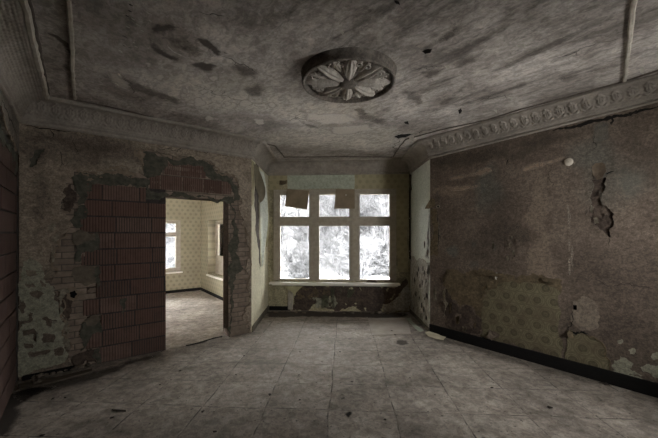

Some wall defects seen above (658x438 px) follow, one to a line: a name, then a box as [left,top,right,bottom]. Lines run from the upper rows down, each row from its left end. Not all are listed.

leakage [152,39,221,81]
leakage [306,113,374,135]
spalling [587,162,614,245]
spalling [0,106,261,419]
spalling [293,256,482,334]
peeling [612,348,658,382]